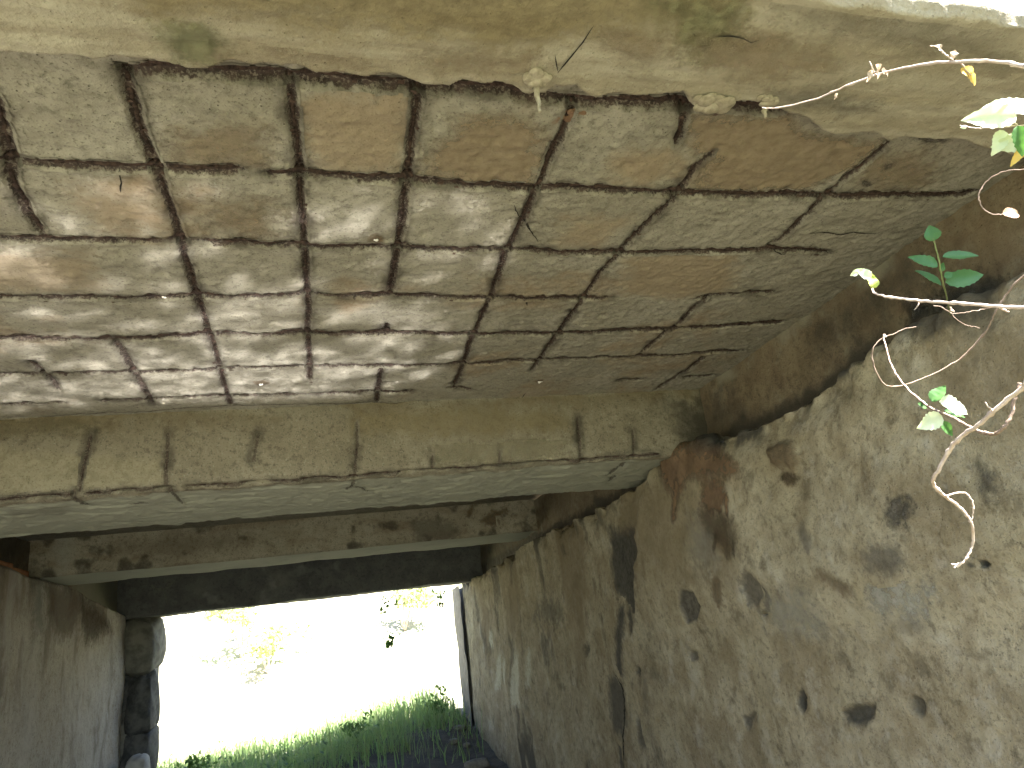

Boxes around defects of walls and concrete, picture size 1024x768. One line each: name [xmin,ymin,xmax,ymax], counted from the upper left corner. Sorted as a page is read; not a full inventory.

rust [270,85,290,154]
rust [300,90,409,186]
rust [415,98,546,183]
rust [590,113,876,191]
rust [0,172,169,302]
spalling [0,59,980,406]
rust [539,207,752,304]
rust [660,441,741,522]
damp [856,496,935,646]
damp [604,511,643,768]